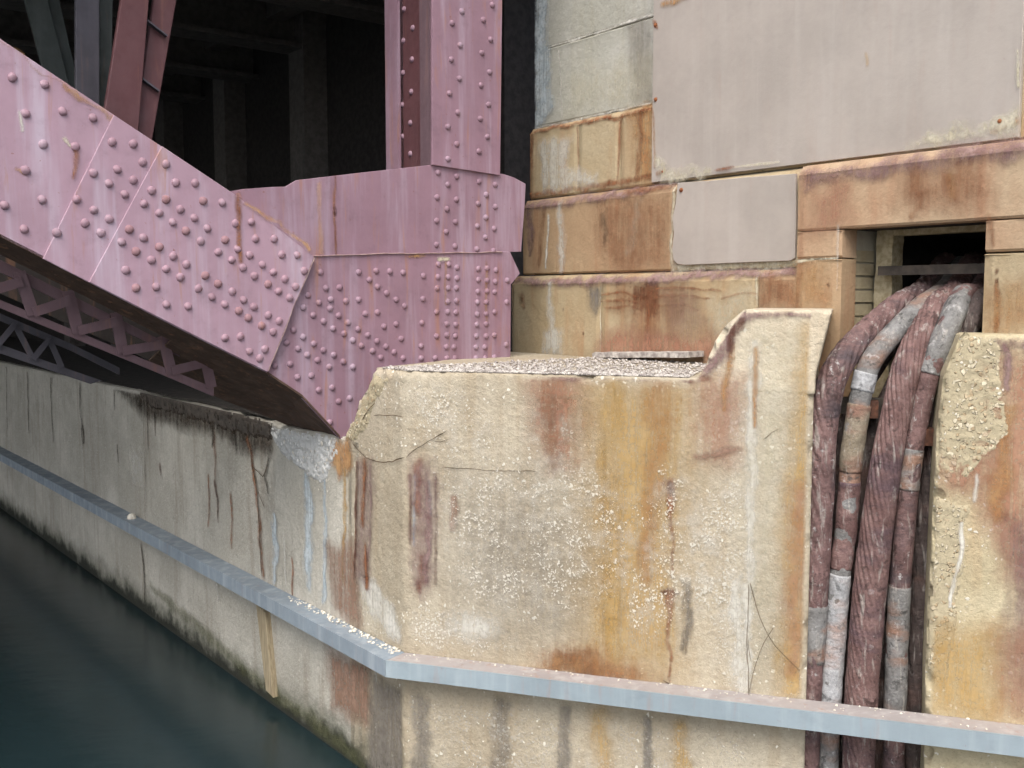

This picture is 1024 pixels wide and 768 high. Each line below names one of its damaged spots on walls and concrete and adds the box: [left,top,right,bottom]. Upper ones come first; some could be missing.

damp [114,391,273,454]
corrosion [332,440,372,589]
crack [353,404,448,479]
corrosion [409,461,437,591]
corrosion [550,383,682,680]
corrosion [515,267,829,460]
spalling [937,336,1010,487]
crack [744,585,752,693]